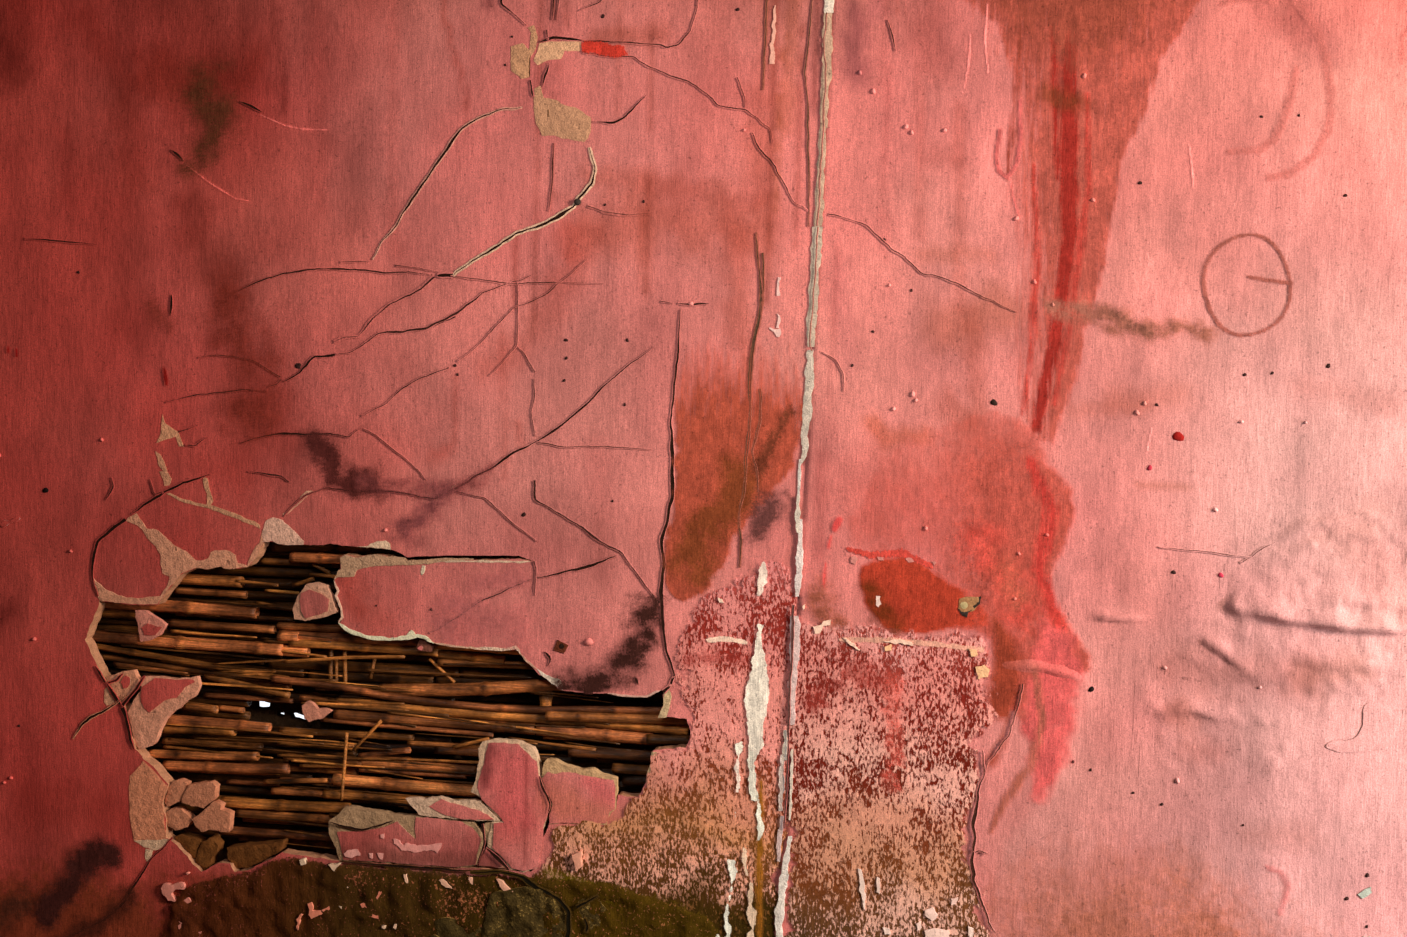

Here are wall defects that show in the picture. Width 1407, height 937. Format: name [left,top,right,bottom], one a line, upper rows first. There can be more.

flaking render [504,25,591,142]
damp [946,0,1214,833]
crack [90,0,1024,937]
flaking render [293,540,559,687]
peeling [969,649,990,679]
flaking render [302,700,333,722]
flaking render [607,690,672,718]
flaking render [129,761,168,862]
peeling [328,834,442,871]
damp [0,868,191,937]
peeling [858,869,880,909]
peeling [916,897,958,937]